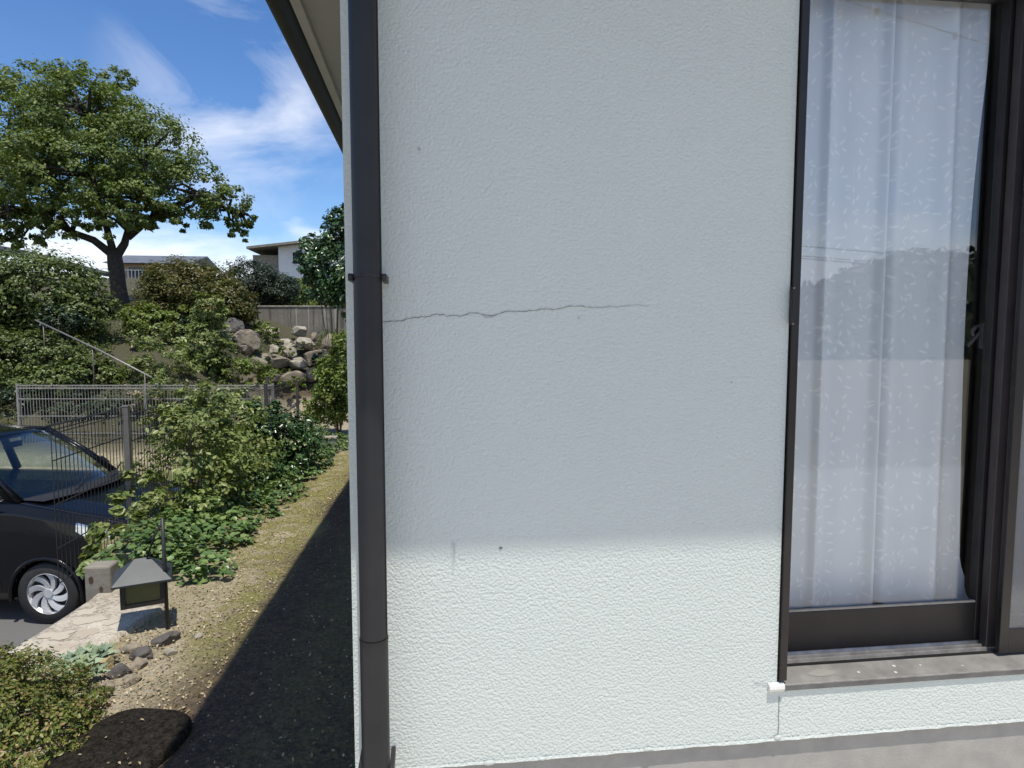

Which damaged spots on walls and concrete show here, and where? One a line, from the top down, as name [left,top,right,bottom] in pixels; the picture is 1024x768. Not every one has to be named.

crack [384,304,648,322]